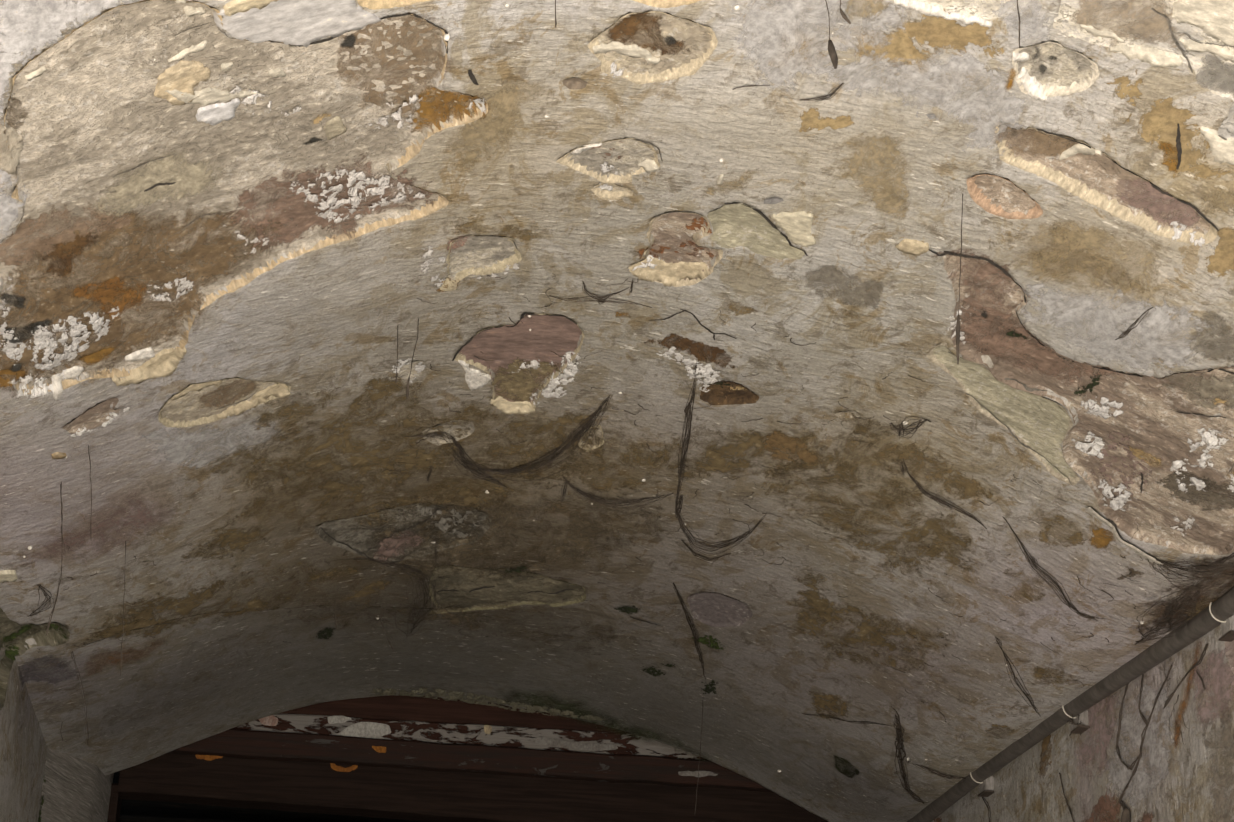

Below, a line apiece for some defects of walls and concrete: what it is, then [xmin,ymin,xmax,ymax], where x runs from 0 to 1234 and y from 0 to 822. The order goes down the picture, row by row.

flaking render [587,0,718,84]
peeling [889,0,1041,30]
peeling [1006,0,1234,165]
flaking render [0,0,489,437]
flaking render [556,138,662,200]
flaking render [629,197,816,287]
flaking render [966,122,1219,248]
flaking render [452,312,585,415]
flaking render [700,381,759,405]
flaking render [896,239,1234,555]
leakage [83,376,993,673]
flaking render [0,608,70,711]